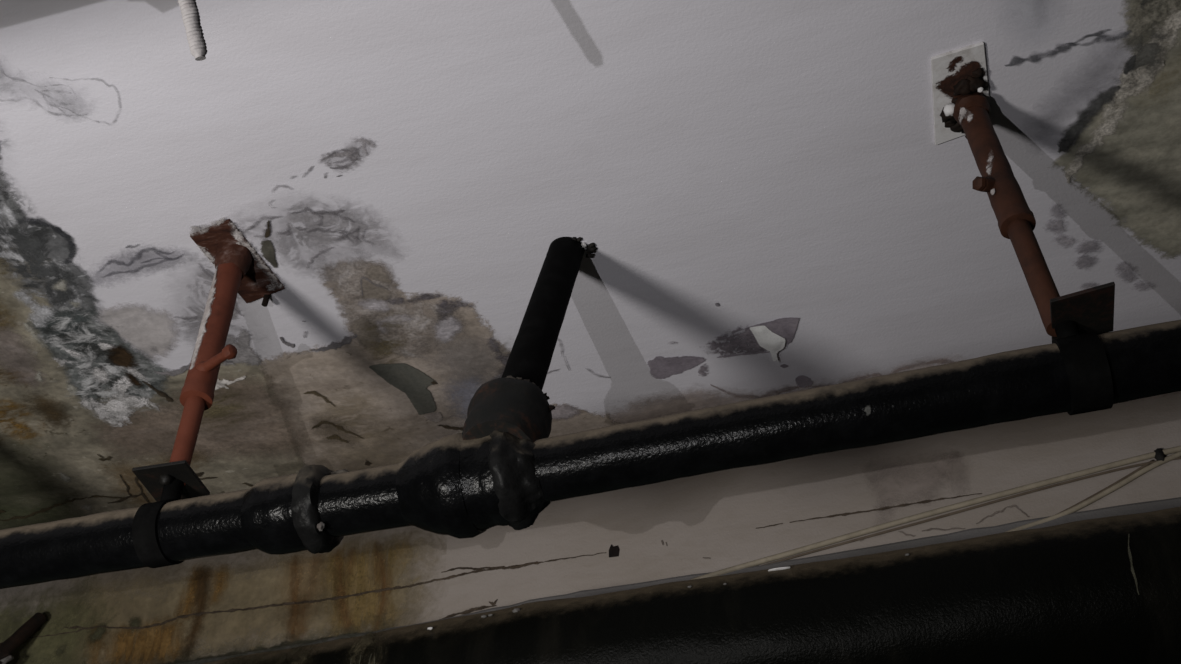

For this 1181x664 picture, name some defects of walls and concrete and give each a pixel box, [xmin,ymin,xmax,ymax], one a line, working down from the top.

damp [1065,10,1181,183]
damp [270,204,461,358]
peeling [0,174,191,530]
damp [79,366,158,427]
damp [96,306,177,358]
damp [215,376,246,390]
peeling [190,262,511,495]
peeling [548,404,620,438]
peeling [647,317,800,379]
crack [0,454,150,521]
crack [196,472,253,487]
crack [29,552,606,638]